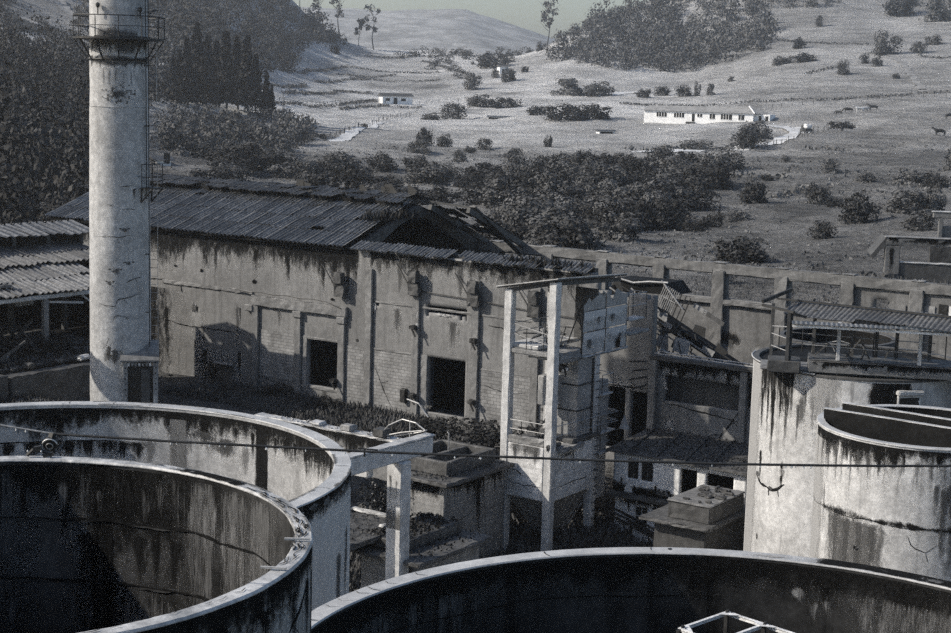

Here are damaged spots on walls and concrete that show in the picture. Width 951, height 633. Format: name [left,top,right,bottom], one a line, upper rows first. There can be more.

damp [150,230,582,295]
damp [0,360,951,633]